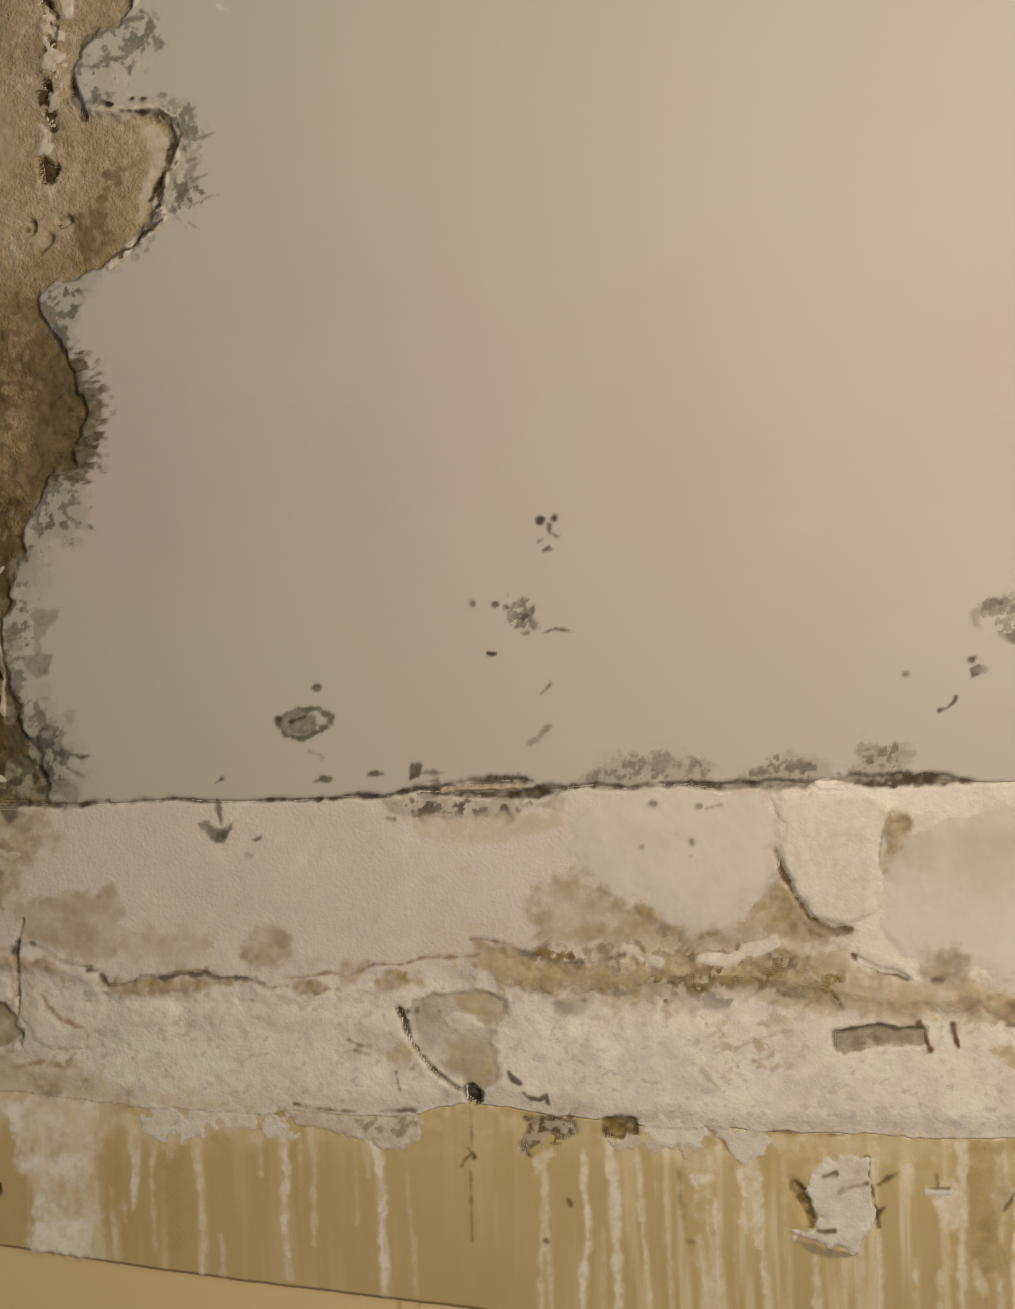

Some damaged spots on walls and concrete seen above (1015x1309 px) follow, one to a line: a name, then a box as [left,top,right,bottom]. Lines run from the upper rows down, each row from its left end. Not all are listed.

flaking render [0,0,184,803]
damp [0,287,128,962]
crack [0,800,115,808]
damp [0,1064,262,1274]
crack [83,965,263,987]
crack [348,1006,550,1105]
damp [567,1133,655,1309]
crack [257,772,970,802]
damp [294,846,1015,1068]
peeling [597,1112,789,1164]
flaking render [790,1153,894,1257]
peeling [770,791,948,981]